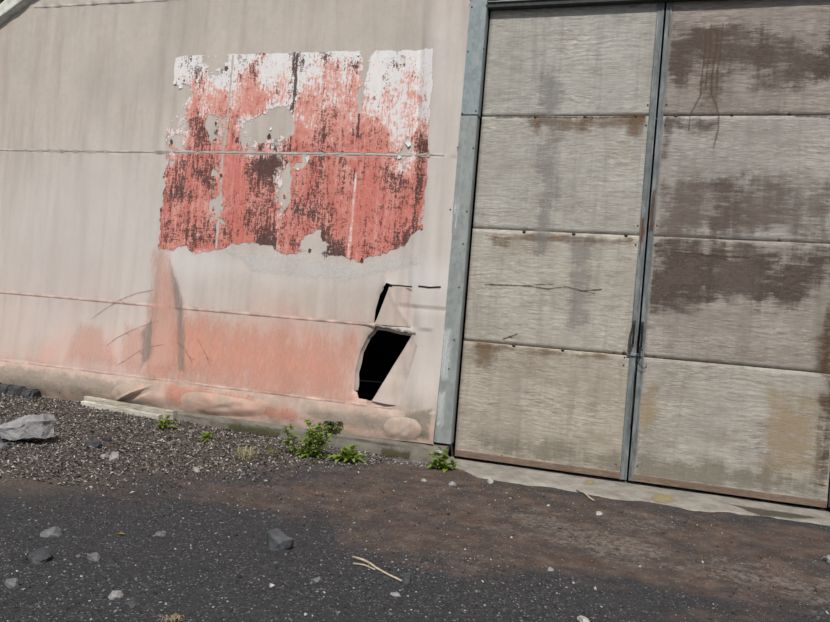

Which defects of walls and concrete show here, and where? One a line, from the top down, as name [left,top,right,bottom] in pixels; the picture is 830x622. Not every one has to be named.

damp [669,24,830,98]
peeling [158,48,433,262]
crack [489,284,602,294]
damp [650,178,830,313]